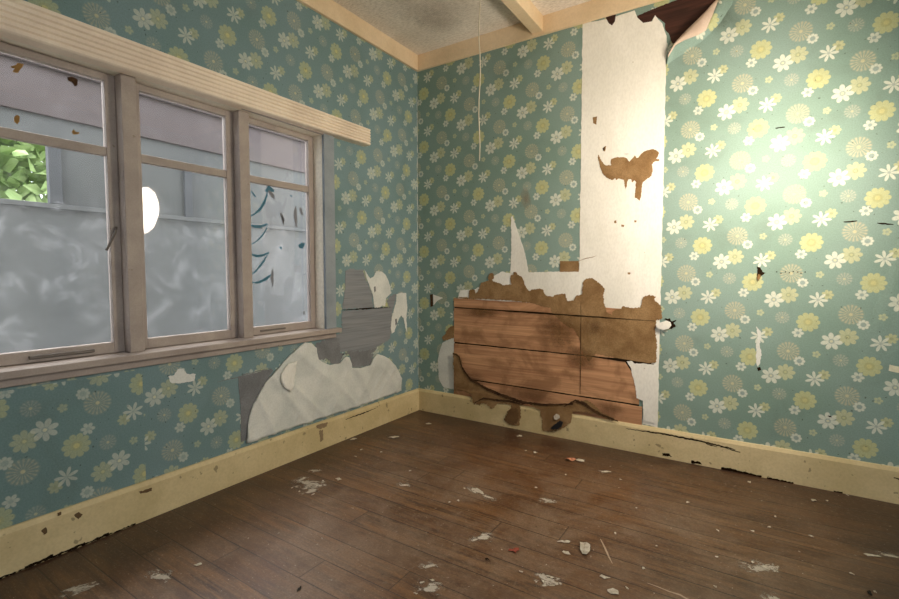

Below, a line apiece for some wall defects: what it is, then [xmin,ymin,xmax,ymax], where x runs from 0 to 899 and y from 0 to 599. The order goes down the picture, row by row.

peeling [488,10,667,309]
peeling [315,268,407,368]
peeling [458,287,527,303]
peeling [643,319,660,428]